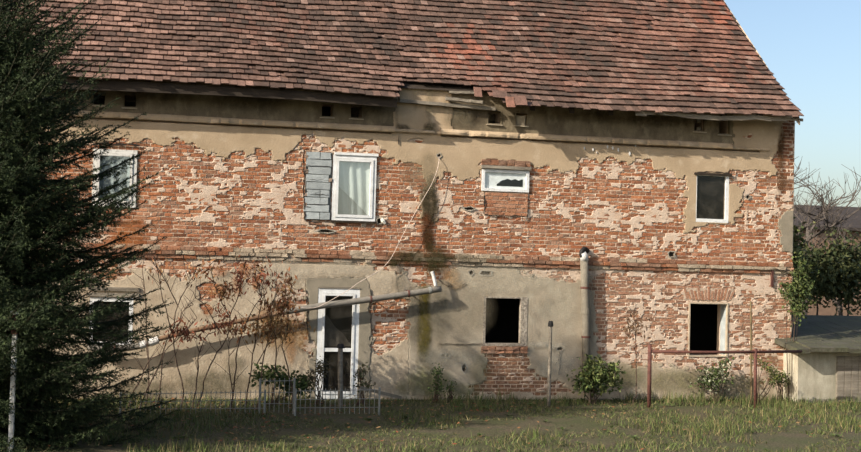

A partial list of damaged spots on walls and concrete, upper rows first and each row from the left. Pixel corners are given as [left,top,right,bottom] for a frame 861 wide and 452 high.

flaking render [47,121,795,396]
leakage [421,186,437,250]